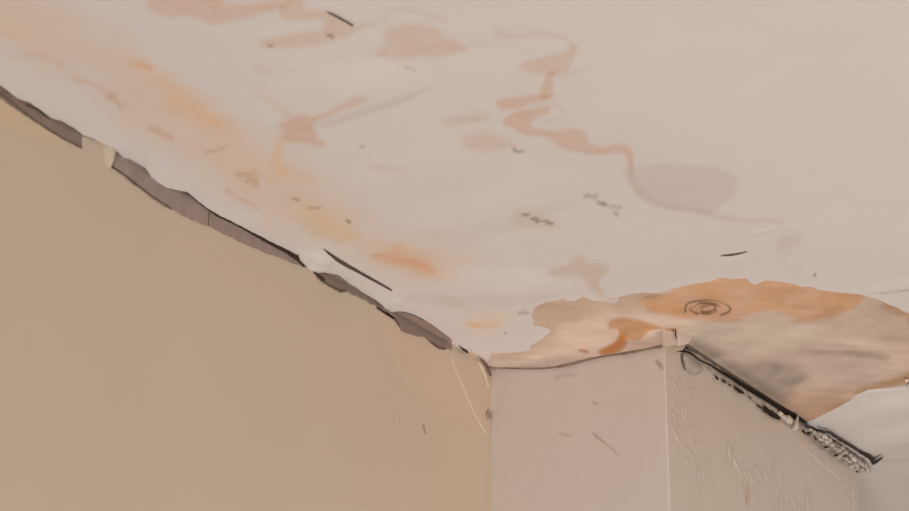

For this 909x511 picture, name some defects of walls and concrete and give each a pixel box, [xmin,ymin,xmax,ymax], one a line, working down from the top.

peeling [0,57,501,351]
water stain [0,0,528,337]
water stain [143,0,807,261]
water stain [545,254,619,303]
peeling [469,269,909,473]